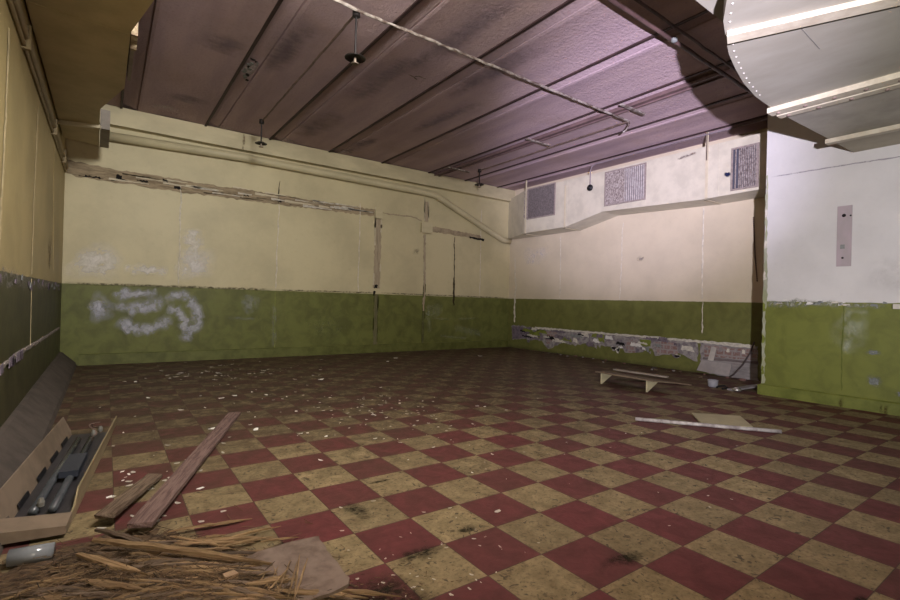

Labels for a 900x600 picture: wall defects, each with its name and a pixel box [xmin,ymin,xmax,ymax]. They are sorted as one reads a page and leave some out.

damp [121,290,202,339]
peeling [67,159,382,345]
spalling [511,175,887,383]